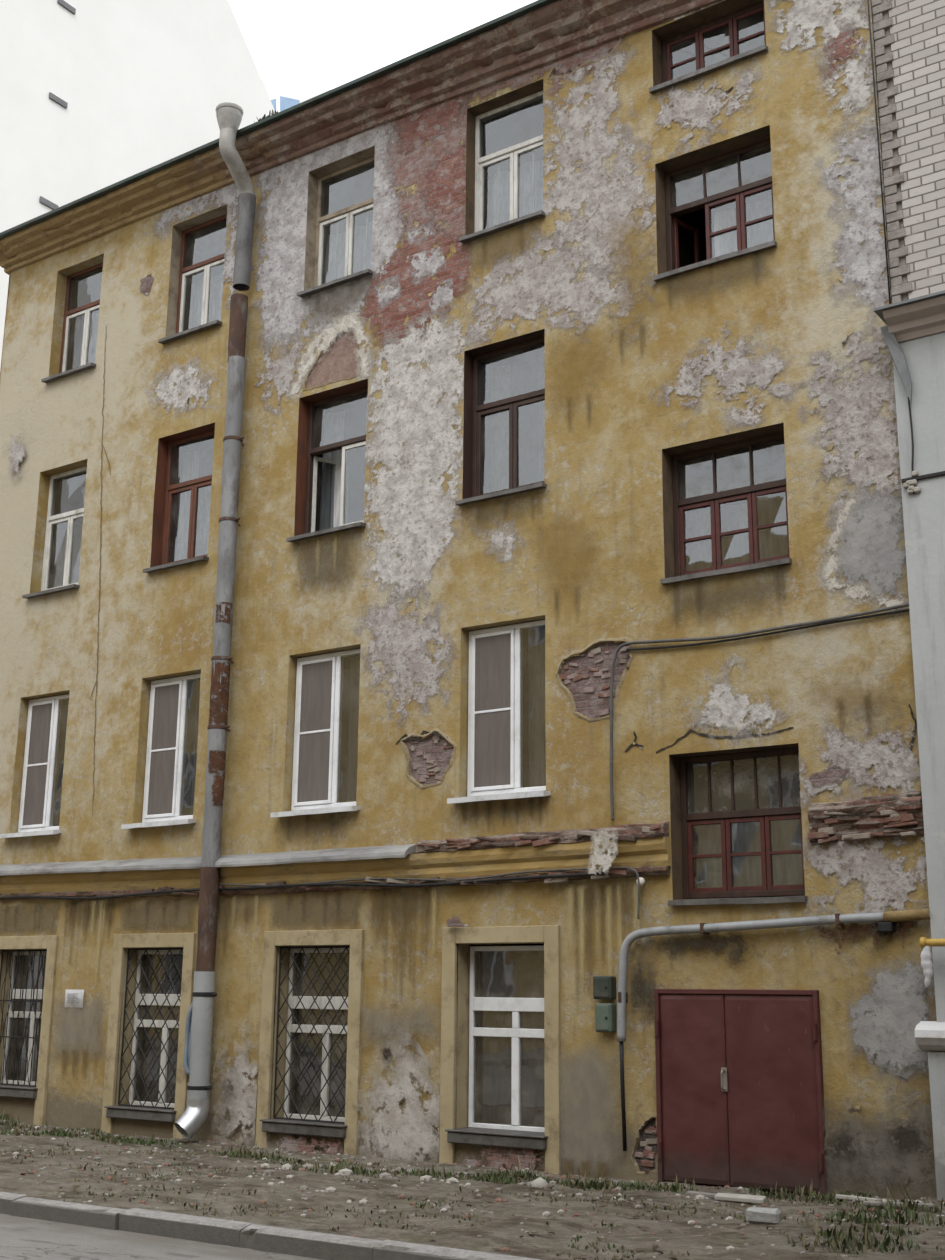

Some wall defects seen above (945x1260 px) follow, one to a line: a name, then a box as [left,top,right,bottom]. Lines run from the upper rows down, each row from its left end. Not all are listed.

peeling [769,0,891,309]
peeling [253,37,656,722]
peeling [661,329,794,426]
flaking render [820,492,906,615]
rust [215,602,232,624]
rust [208,750,226,806]
rust [209,662,231,726]
flaking render [416,821,669,884]
crack [625,720,793,753]
flaking render [799,705,928,925]
damp [568,885,639,976]
peeling [850,960,935,1082]